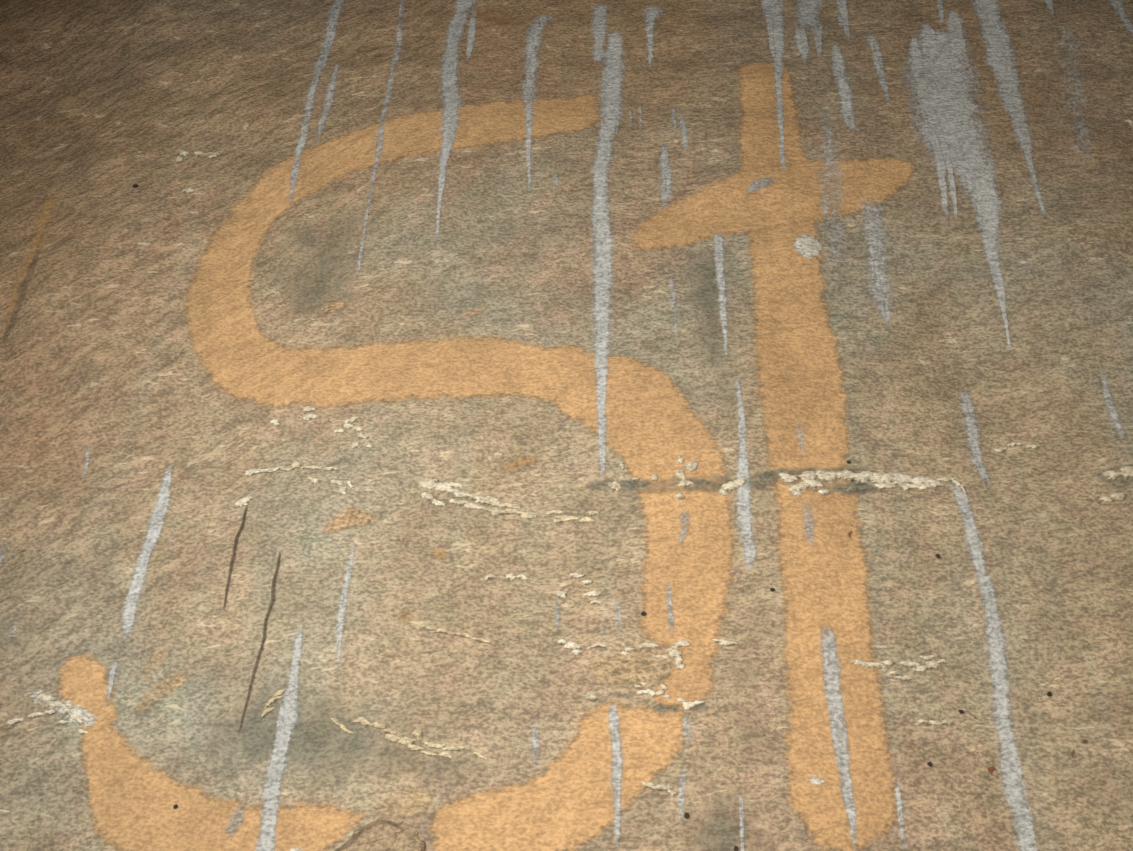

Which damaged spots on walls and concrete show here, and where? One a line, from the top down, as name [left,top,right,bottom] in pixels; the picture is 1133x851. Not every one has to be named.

leakage [289,0,344,197]
leakage [436,0,477,236]
leakage [523,16,551,187]
leakage [591,5,642,472]
leakage [701,235,727,355]
leakage [762,0,856,255]
leakage [863,201,891,323]
leakage [903,0,1011,347]
leakage [972,0,1046,215]
leakage [122,466,171,635]
leakage [249,630,316,851]
leakage [952,484,1037,851]